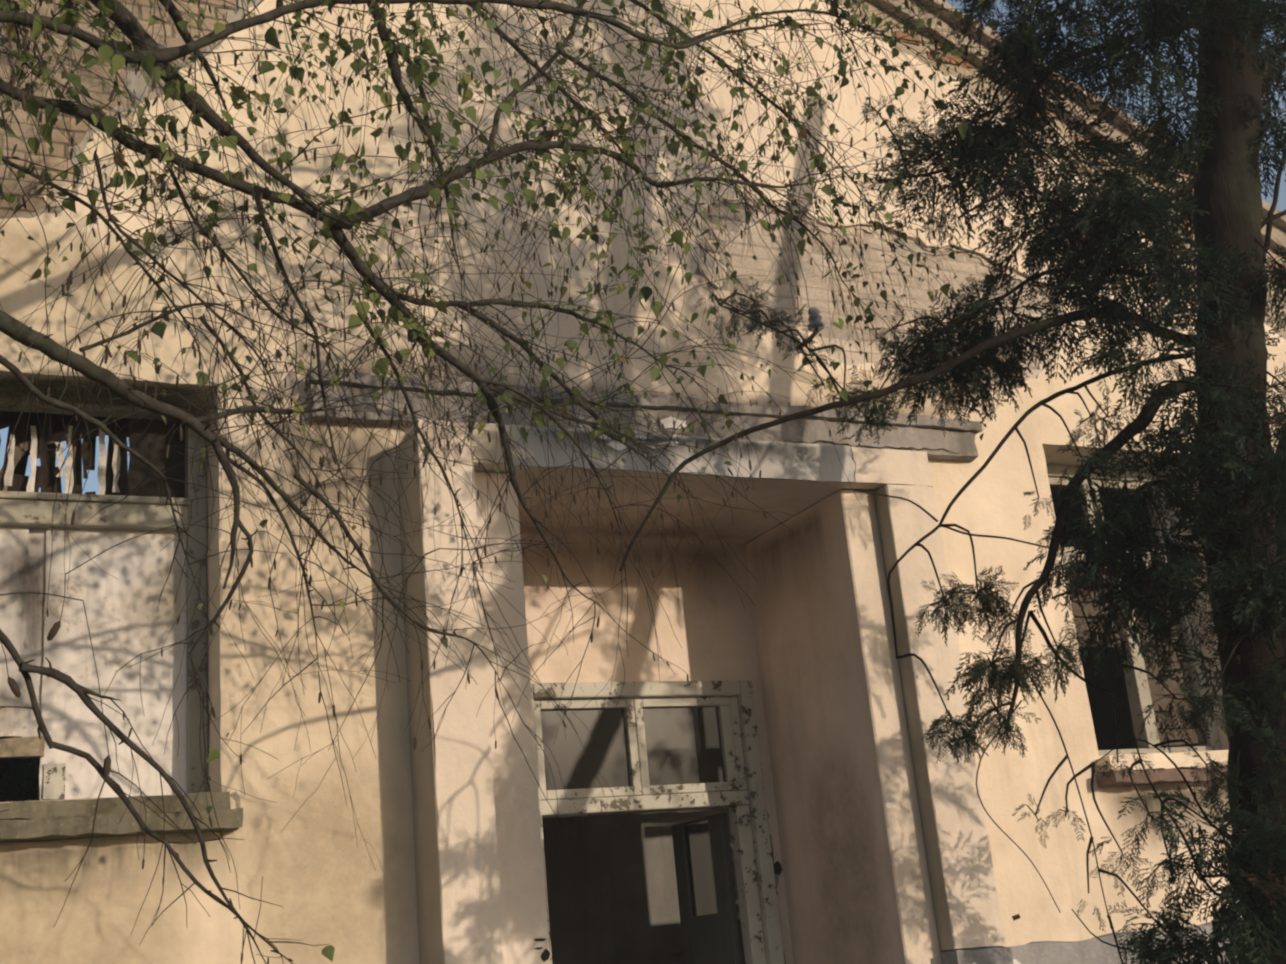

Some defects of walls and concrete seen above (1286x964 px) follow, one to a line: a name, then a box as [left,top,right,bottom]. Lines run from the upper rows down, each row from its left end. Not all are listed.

flaking render [0,0,165,219]
flaking render [118,0,261,67]
flaking render [690,199,1067,389]
water stain [12,551,43,649]